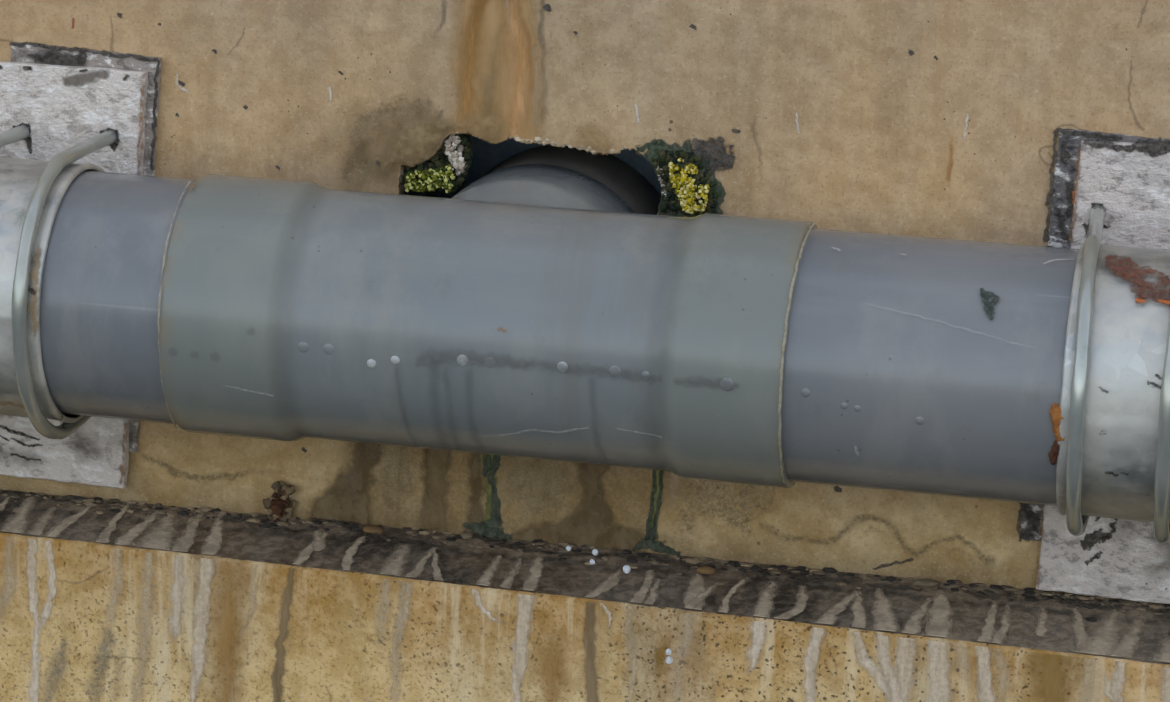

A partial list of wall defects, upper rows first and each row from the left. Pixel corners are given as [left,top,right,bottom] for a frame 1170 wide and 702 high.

rust [454,0,541,142]
spalling [444,126,481,176]
spalling [508,135,633,155]
water stain [0,497,93,702]
water stain [95,504,224,702]
water stain [271,442,381,702]
water stain [472,556,544,702]
water stain [512,463,679,553]
water stain [584,570,621,702]
water stain [747,582,808,668]
water stain [804,590,1010,702]
water stain [1073,608,1144,702]